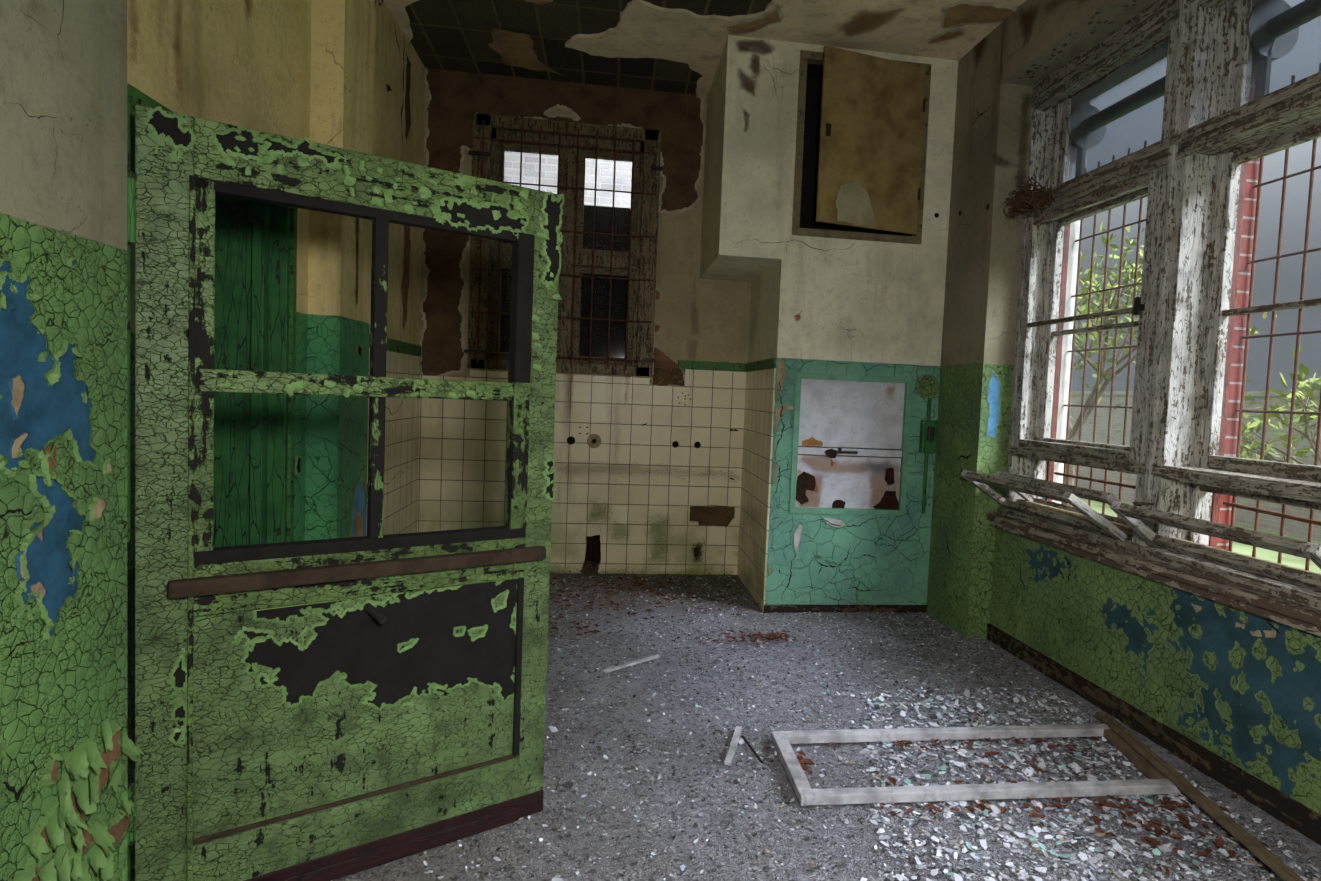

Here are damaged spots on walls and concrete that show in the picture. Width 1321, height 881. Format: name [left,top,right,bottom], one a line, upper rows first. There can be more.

damp [836,6,907,38]
peeling [985,371,1003,440]
peeling [0,254,113,643]
corrosion [795,437,901,509]
crack [0,504,37,518]
peeling [689,506,735,527]
crack [813,543,900,591]
crack [93,592,114,644]
crack [3,641,30,664]
peeling [1098,587,1321,797]
crack [3,766,39,803]
peeling [13,718,144,881]